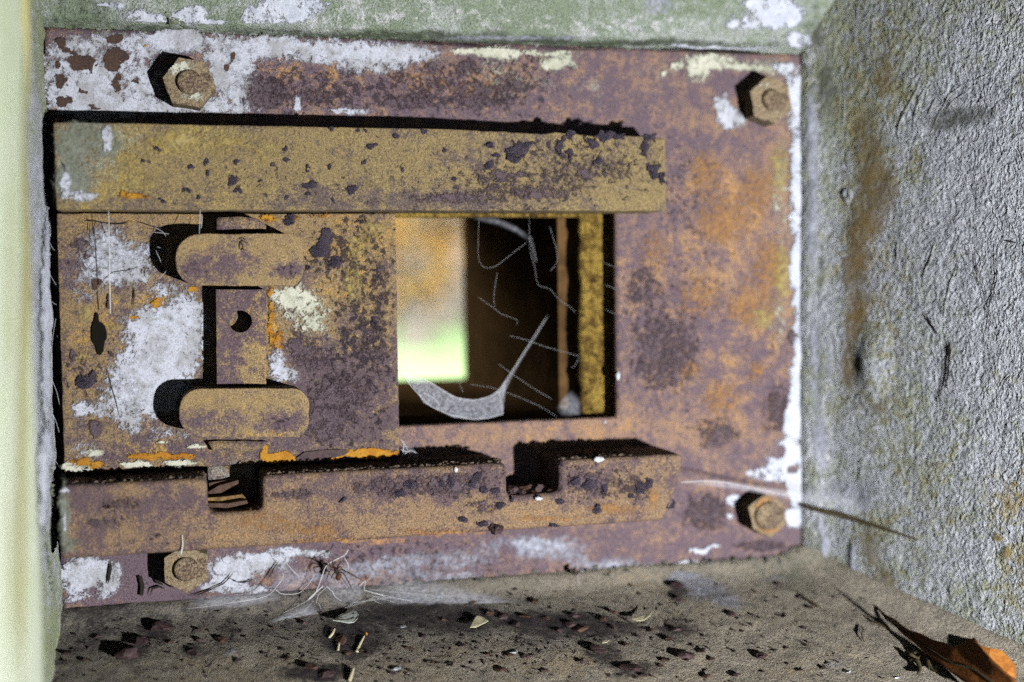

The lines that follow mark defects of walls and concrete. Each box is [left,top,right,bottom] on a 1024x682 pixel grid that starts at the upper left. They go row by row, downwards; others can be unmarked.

corrosion [55,35,139,110]
peeling [43,0,584,202]
corrosion [77,279,139,360]
corrosion [626,231,791,399]
damp [658,43,893,529]
peeling [44,223,214,603]
corrosion [759,383,790,432]
corrosion [259,445,297,465]
corrosion [329,447,399,462]
corrosion [208,469,660,545]
damp [818,515,830,557]
damp [850,537,869,572]